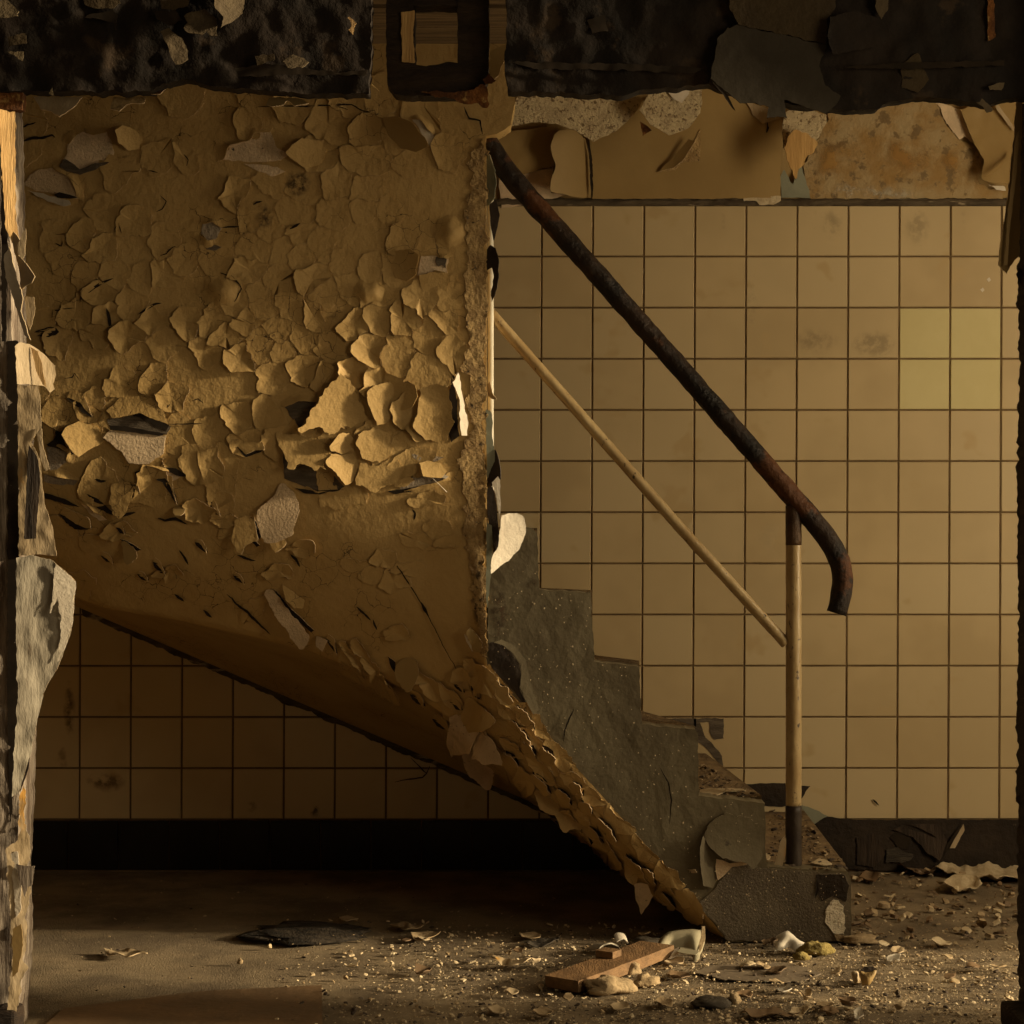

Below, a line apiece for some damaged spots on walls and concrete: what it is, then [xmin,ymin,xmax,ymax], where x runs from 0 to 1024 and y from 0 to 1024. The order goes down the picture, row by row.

peeling [4,71,851,1011]